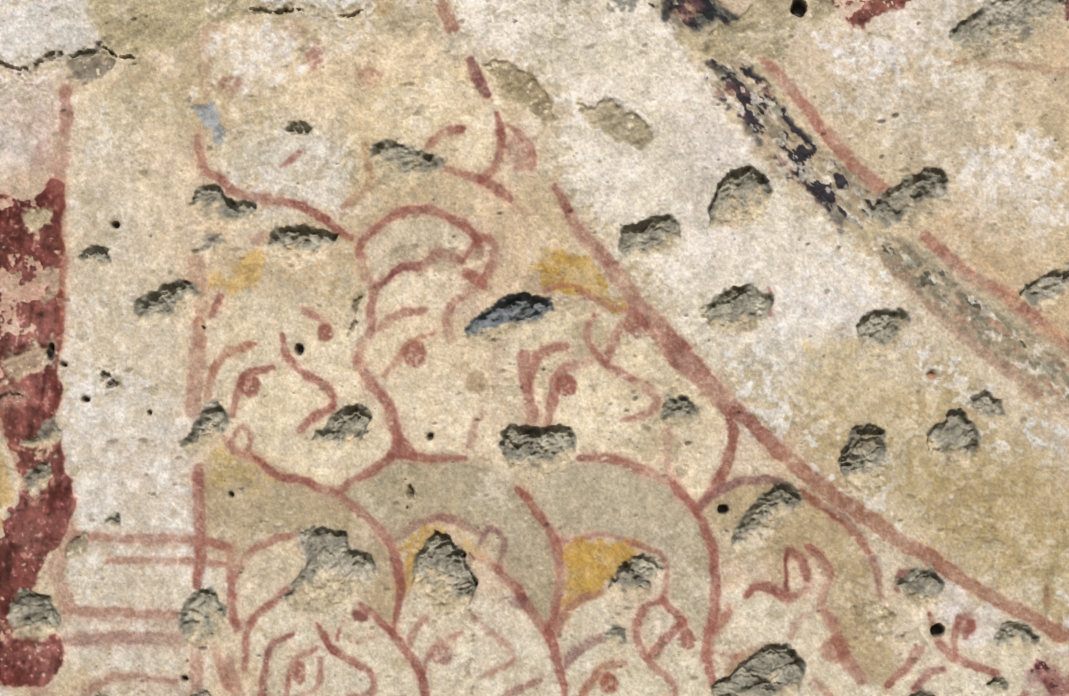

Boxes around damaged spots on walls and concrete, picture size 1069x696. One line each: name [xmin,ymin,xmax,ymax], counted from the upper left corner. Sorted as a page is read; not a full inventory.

crack [0,43,140,78]
peeling [644,0,1069,411]
spalling [625,231,681,262]
spalling [503,447,577,480]
spalling [927,443,977,470]
spalling [287,571,376,619]
spalling [413,569,473,618]
spalling [758,678,804,696]